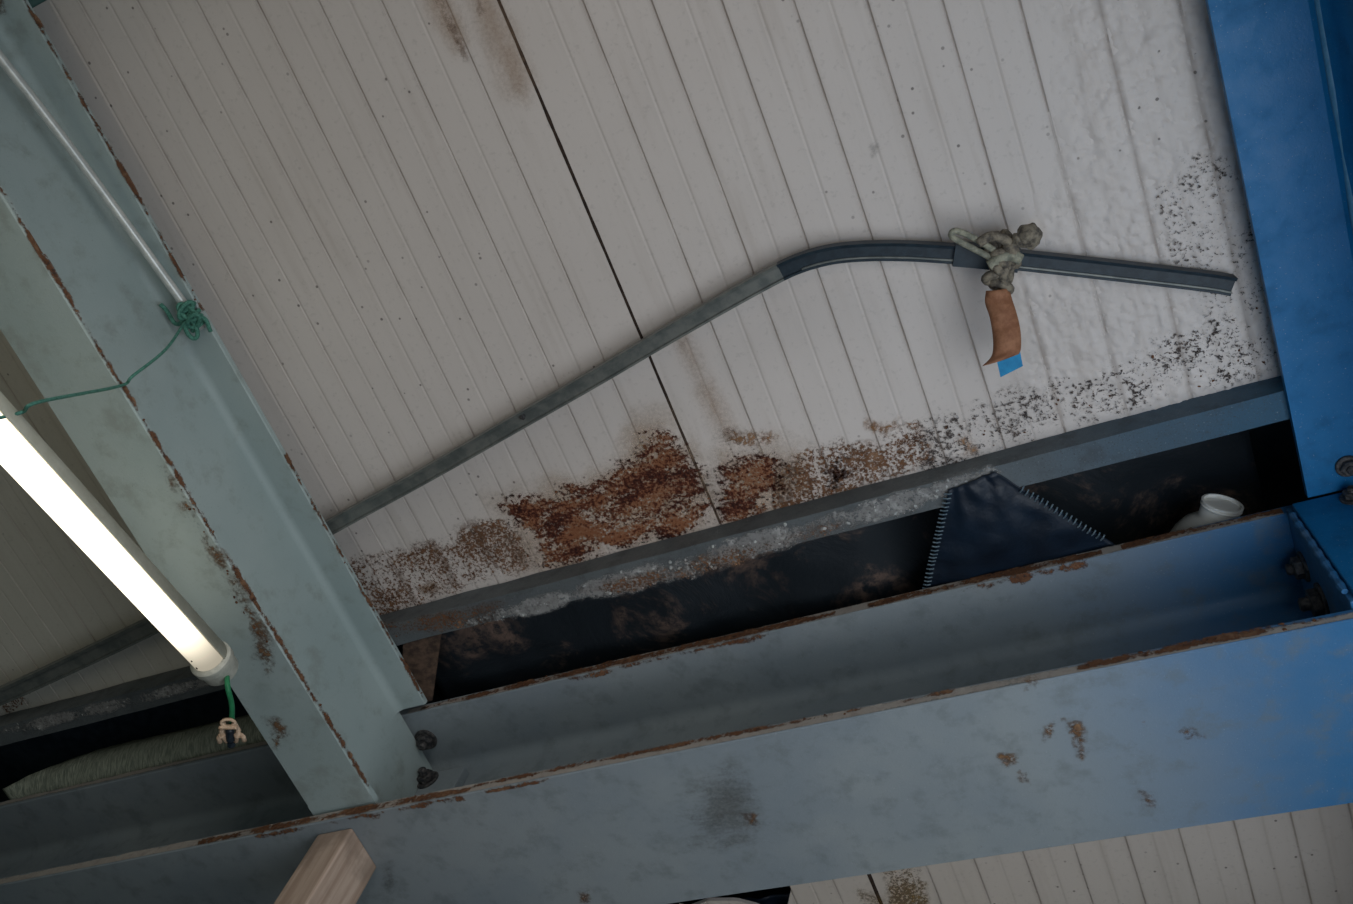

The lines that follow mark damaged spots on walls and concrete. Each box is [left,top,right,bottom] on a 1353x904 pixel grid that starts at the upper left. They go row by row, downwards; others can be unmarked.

leakage [918,154,1276,471]
corrosion [0,187,369,786]
corrosion [198,714,827,845]
corrosion [284,422,935,710]
corrosion [1069,721,1085,759]
corrosion [1077,616,1336,670]